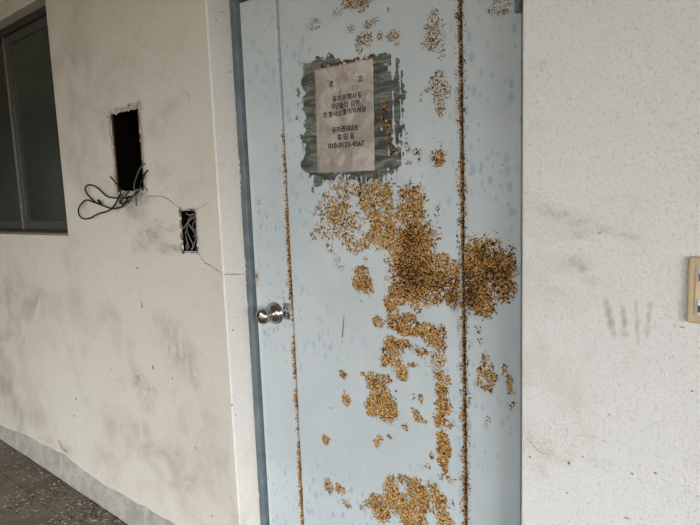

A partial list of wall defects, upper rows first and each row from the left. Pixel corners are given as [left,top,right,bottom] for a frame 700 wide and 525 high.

rust [281,131,294,322]
rust [310,0,521,525]
rust [291,335,304,525]